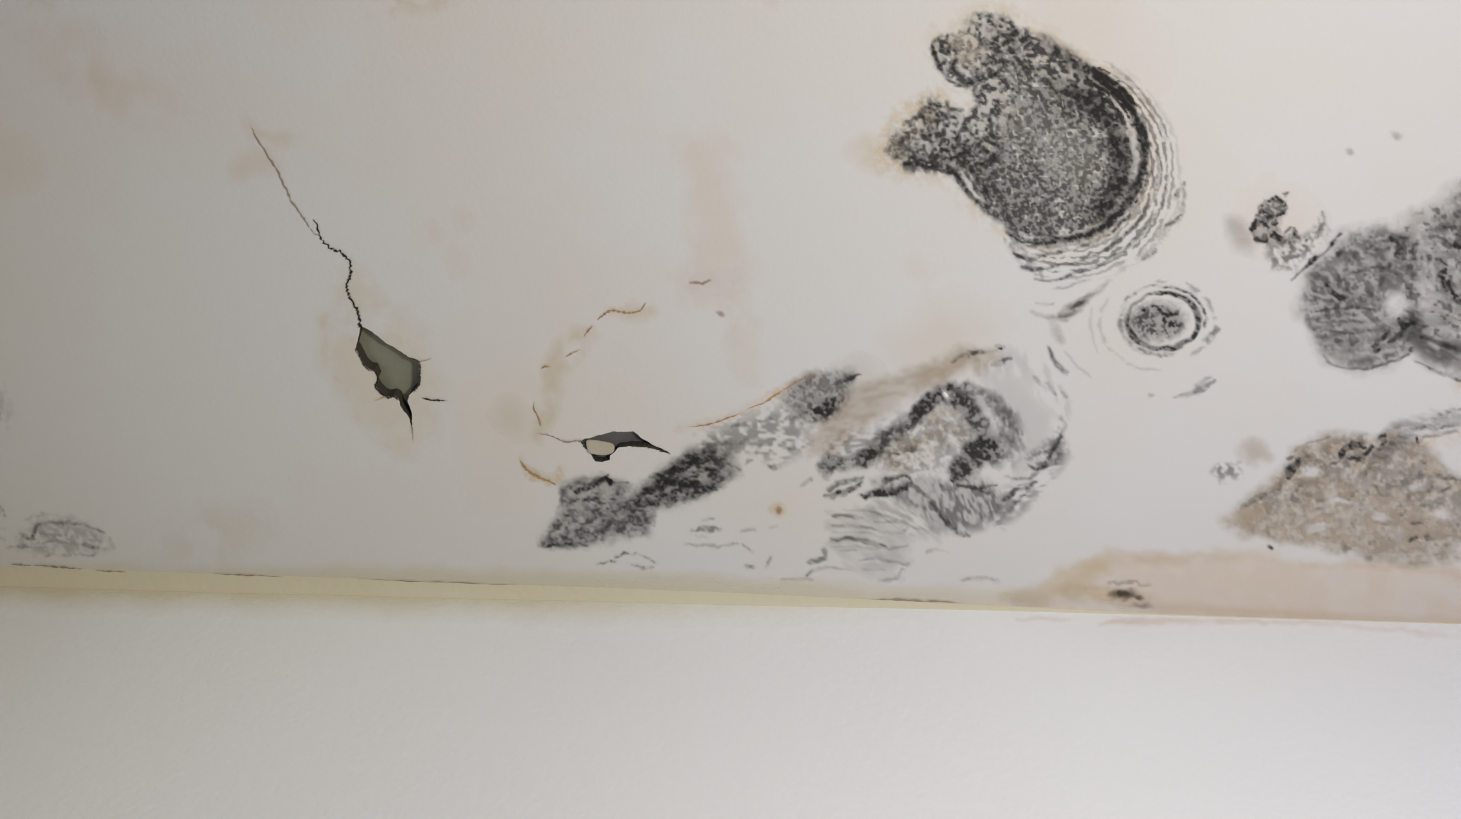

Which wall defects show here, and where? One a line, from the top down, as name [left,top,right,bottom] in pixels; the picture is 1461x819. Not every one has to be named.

damp [889,14,1150,271]
crack [253,130,362,327]
damp [1250,196,1299,243]
damp [1126,287,1206,351]
damp [1305,233,1461,369]
spalling [355,327,444,440]
peeling [540,431,670,462]
damp [544,450,725,547]
damp [808,375,857,420]
damp [821,362,1062,525]
damp [1238,434,1451,554]